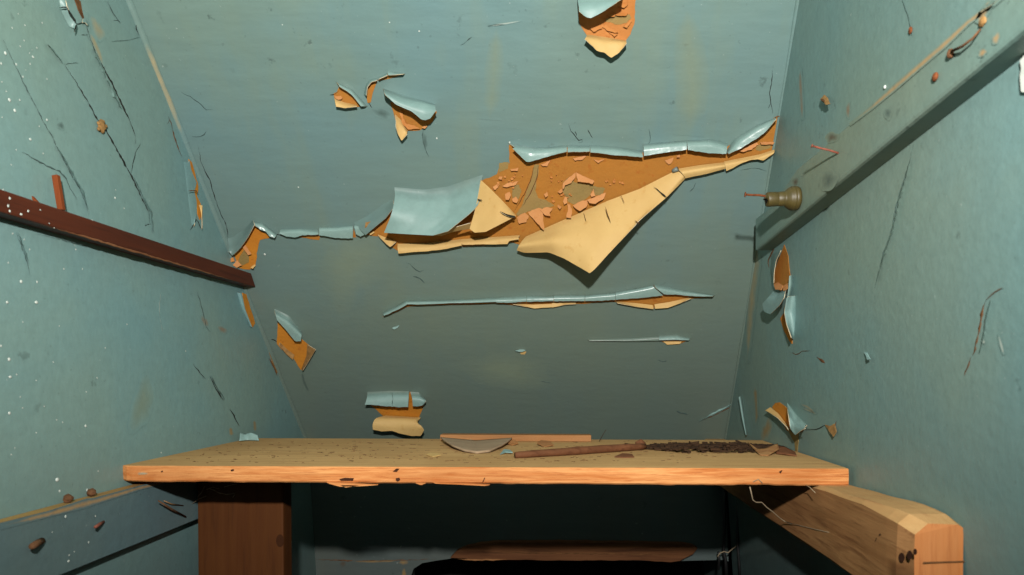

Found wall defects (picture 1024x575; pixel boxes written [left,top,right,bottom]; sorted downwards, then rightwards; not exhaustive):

peeling [578,0,636,58]
crack [3,40,88,208]
crack [50,28,154,231]
peeling [332,70,437,140]
peeling [228,116,780,273]
crack [876,157,911,281]
peeling [269,309,316,394]
peeling [382,284,714,316]
peeling [763,245,796,343]
crack [964,288,1002,375]
peeling [365,391,426,436]
peeling [765,402,837,452]